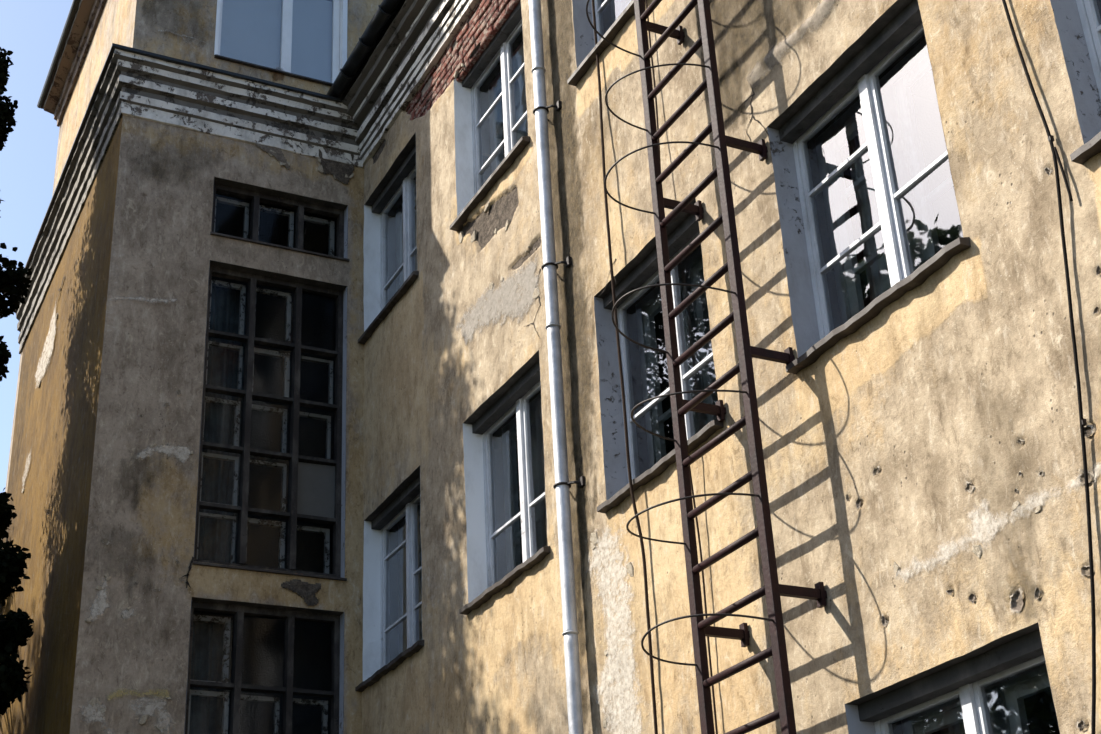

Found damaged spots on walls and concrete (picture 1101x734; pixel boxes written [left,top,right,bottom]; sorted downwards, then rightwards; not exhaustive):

flaking render [406,0,520,121]
flaking render [255,137,290,170]
flaking render [317,149,354,184]
flaking render [458,188,519,250]
flaking render [281,579,321,606]
flaking render [1010,587,1041,613]